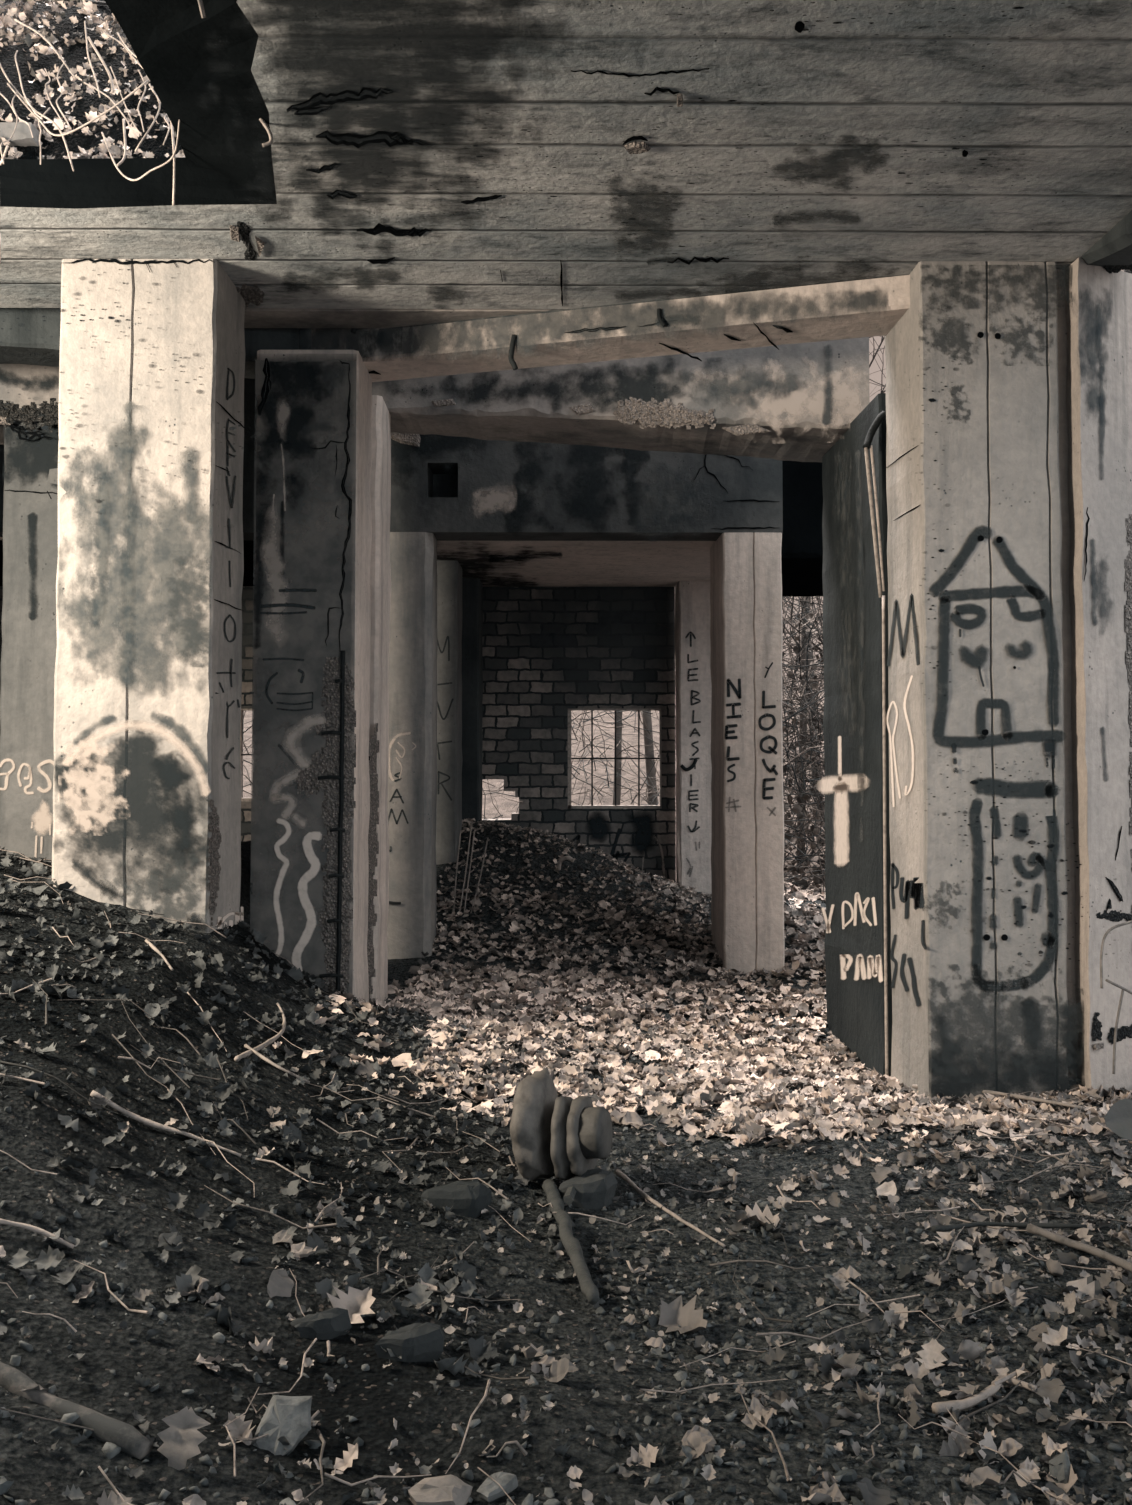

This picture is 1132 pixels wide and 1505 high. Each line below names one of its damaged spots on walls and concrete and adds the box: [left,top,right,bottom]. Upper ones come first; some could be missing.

leakage [243,0,561,235]
leakage [610,173,681,265]
leakage [773,211,860,225]
leakage [774,136,888,189]
leakage [920,265,1073,321]
leakage [254,256,893,648]
leakage [3,402,212,693]
leakage [837,450,865,843]
leakage [53,723,208,899]
leakage [187,913,207,931]